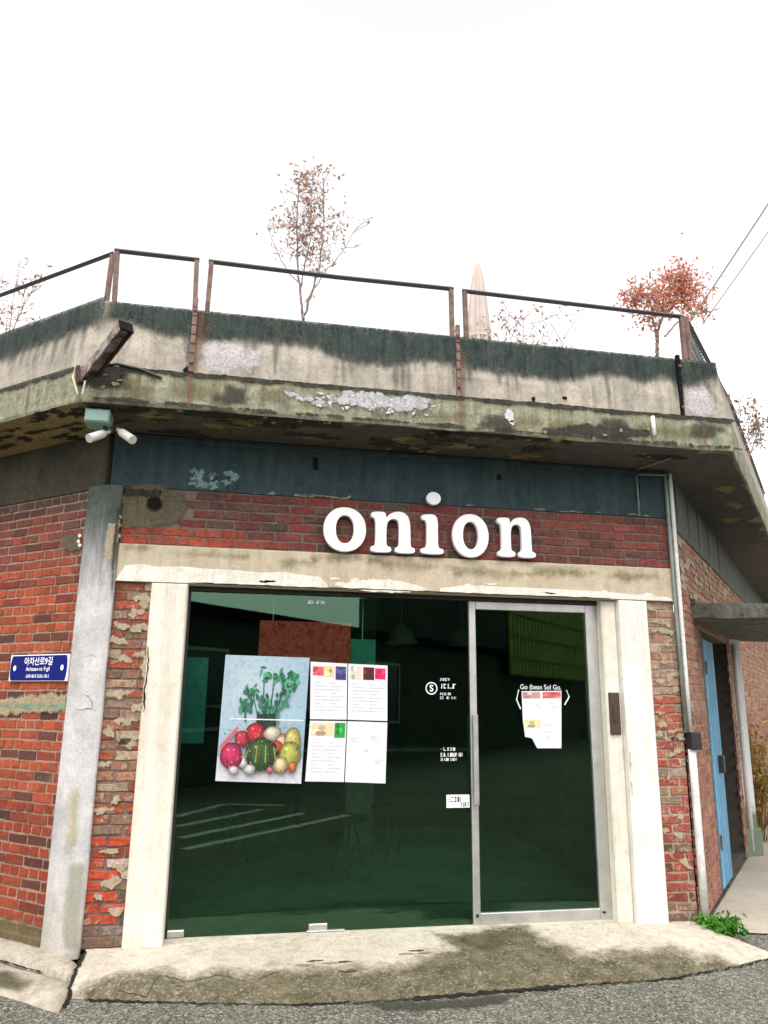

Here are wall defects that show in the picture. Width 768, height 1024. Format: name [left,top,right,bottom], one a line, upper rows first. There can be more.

damp [0,296,741,438]
peeling [284,390,436,416]
peeling [184,468,240,490]
peeling [103,508,673,601]
peeling [0,692,67,716]
flaking render [140,646,149,711]